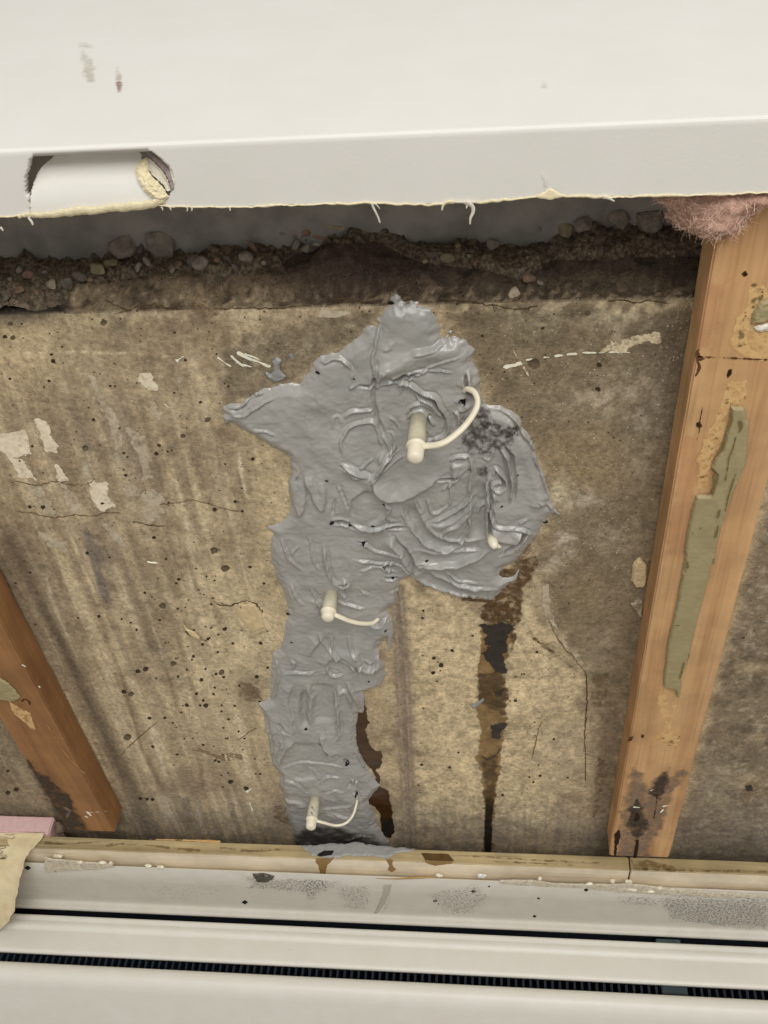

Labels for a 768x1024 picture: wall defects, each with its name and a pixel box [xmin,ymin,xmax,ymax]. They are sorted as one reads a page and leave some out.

spalling [18,151,175,219]
peeling [0,418,127,547]
damp [296,700,395,874]
damp [475,622,515,852]
crack [547,616,594,781]
damp [617,770,687,857]